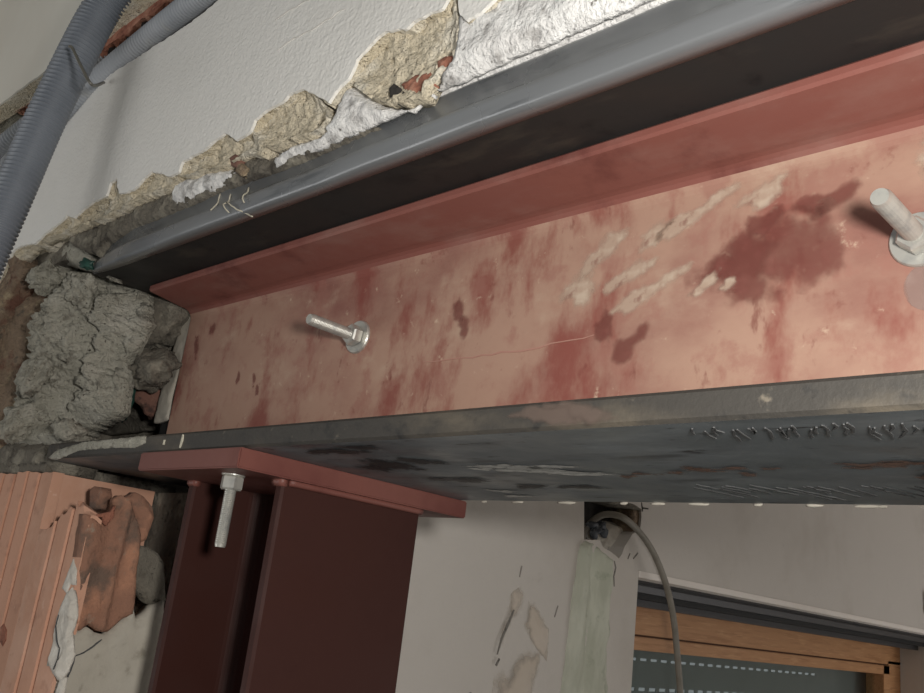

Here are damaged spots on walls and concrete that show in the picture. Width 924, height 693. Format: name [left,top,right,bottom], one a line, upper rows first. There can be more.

flaking render [353,0,460,110]
flaking render [0,91,337,421]